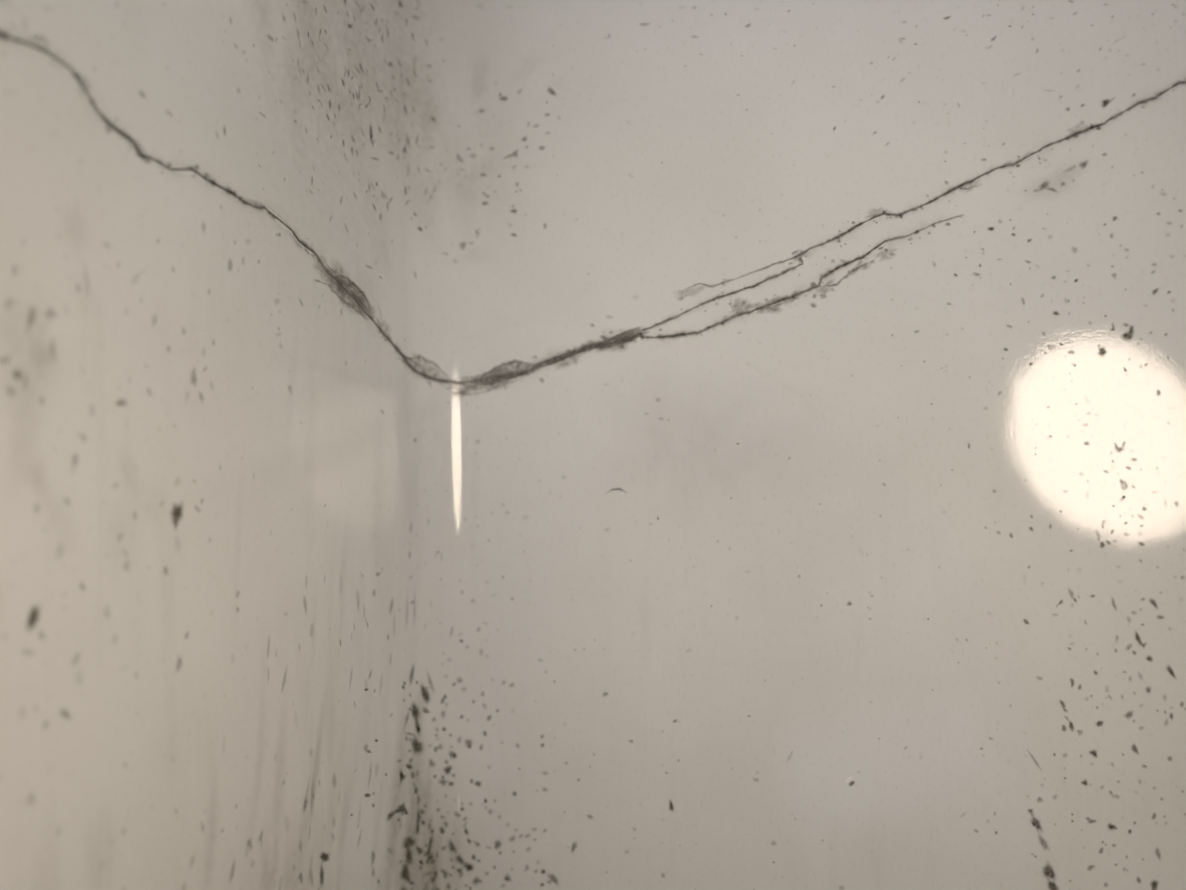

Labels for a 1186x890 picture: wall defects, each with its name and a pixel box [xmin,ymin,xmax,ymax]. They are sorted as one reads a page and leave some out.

crack [0,27,1186,389]
mould [402,670,444,751]
mould [388,803,481,890]